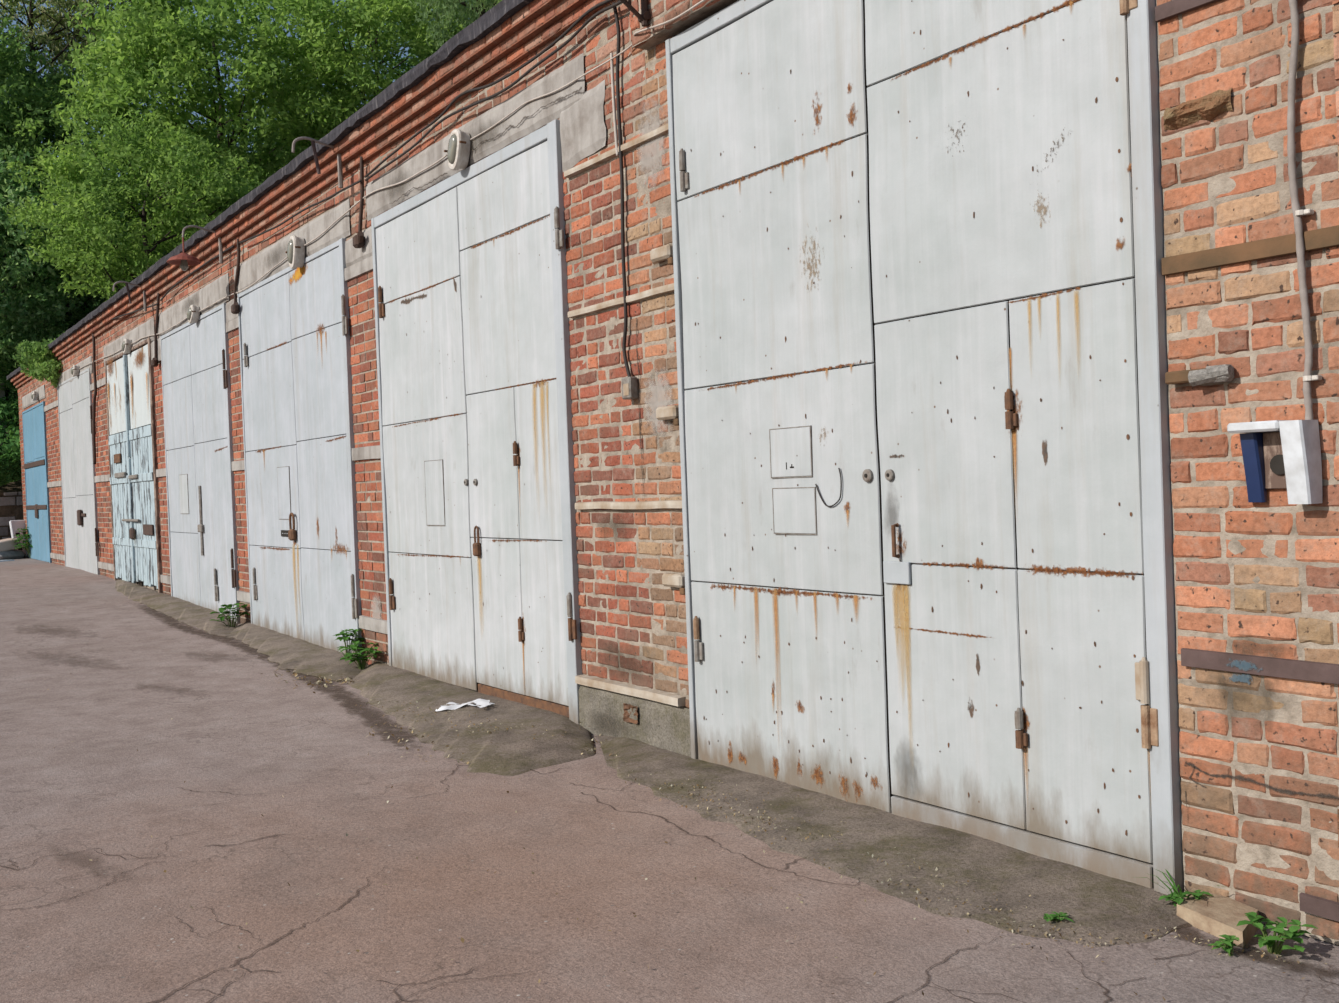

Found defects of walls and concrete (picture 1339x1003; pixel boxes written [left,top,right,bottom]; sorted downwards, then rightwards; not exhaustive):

rust [1009,287,1080,331]
rust [1006,391,1022,479]
rust [923,542,1003,593]
rust [710,568,872,657]
rust [788,739,878,802]
crack [164,907,274,972]
crack [376,964,485,1001]
crack [928,982,1025,1003]